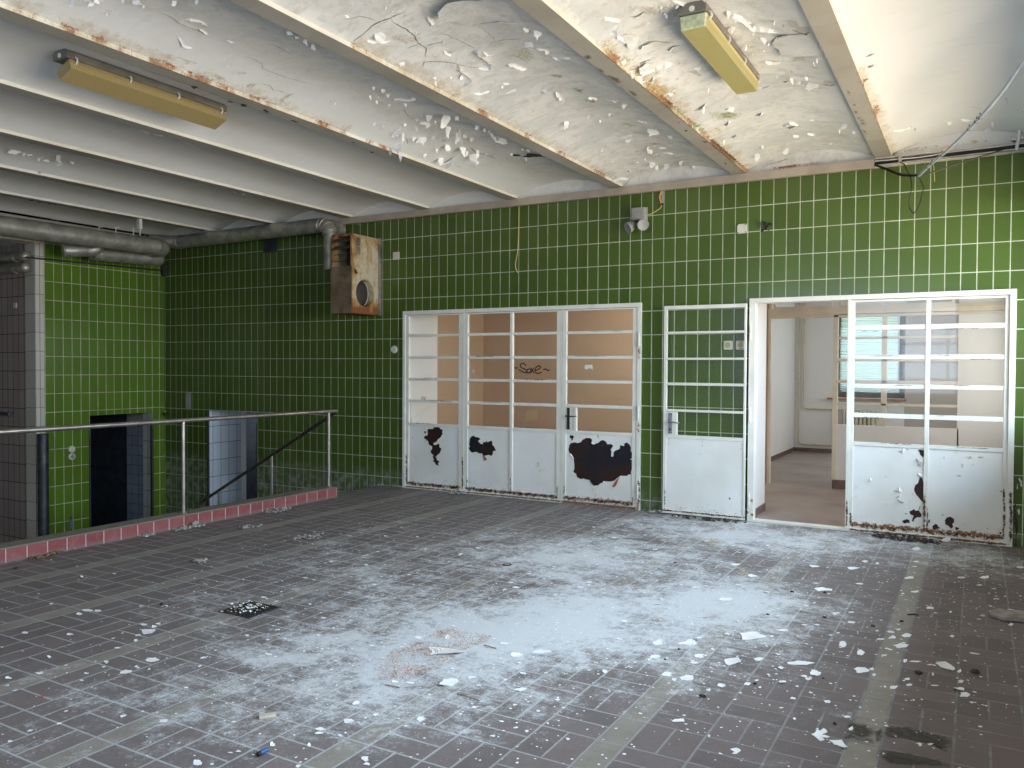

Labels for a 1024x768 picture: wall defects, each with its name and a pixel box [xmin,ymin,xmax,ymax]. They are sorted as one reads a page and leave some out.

peeling [160,1,208,49]
peeling [367,32,390,44]
crack [345,13,527,68]
peeling [443,41,516,95]
corrosion [604,45,675,109]
peeling [597,0,701,99]
peeling [721,11,835,91]
peeling [353,87,543,169]
peeling [598,120,695,183]
corrosion [684,117,747,173]
peeling [782,119,815,155]
corrosion [845,448,1013,545]